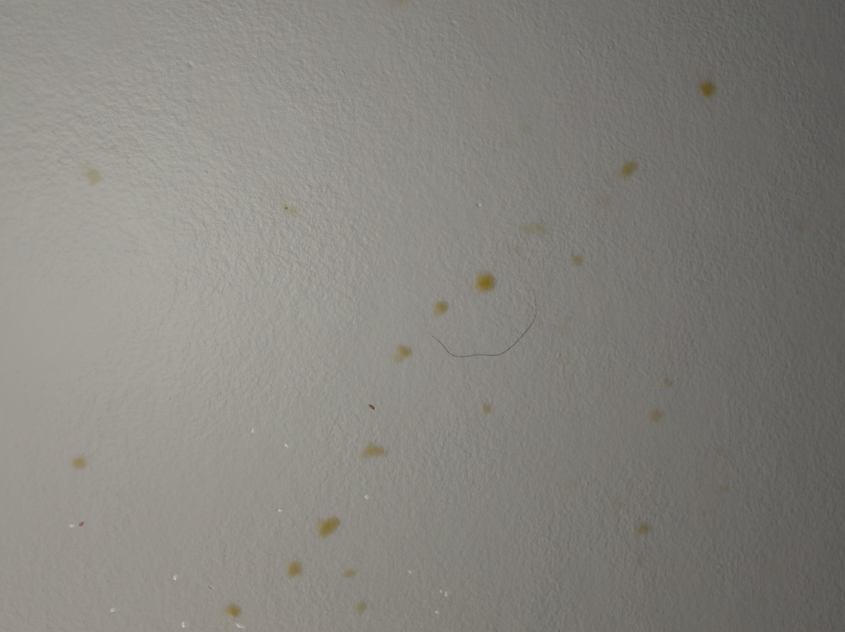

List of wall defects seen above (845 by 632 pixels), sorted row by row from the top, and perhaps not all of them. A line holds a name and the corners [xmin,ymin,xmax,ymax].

leakage [462,260,502,297]
leakage [313,513,343,542]
leakage [283,556,306,582]